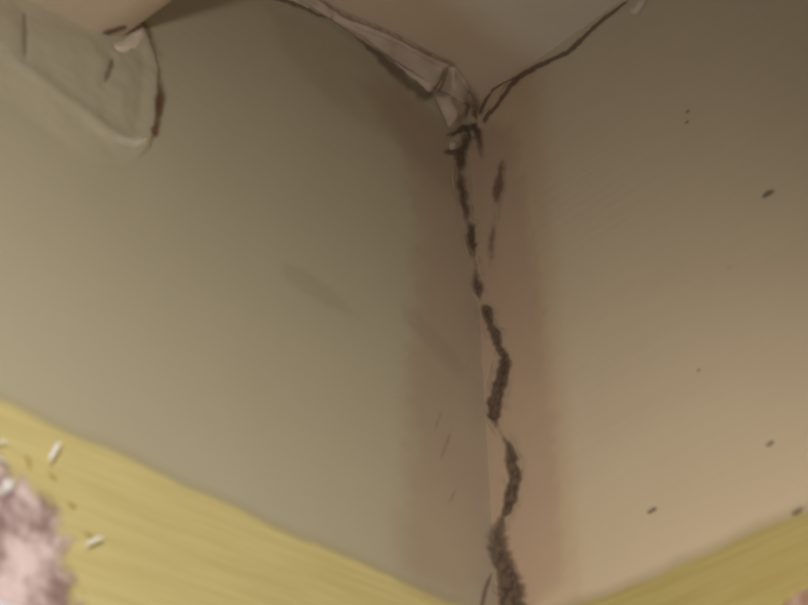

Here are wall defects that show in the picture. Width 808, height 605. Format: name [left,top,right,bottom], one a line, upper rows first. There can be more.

peeling [288,0,473,129]
crack [445,0,645,252]
crack [473,279,510,428]
peeling [0,460,76,605]
crack [490,442,524,605]